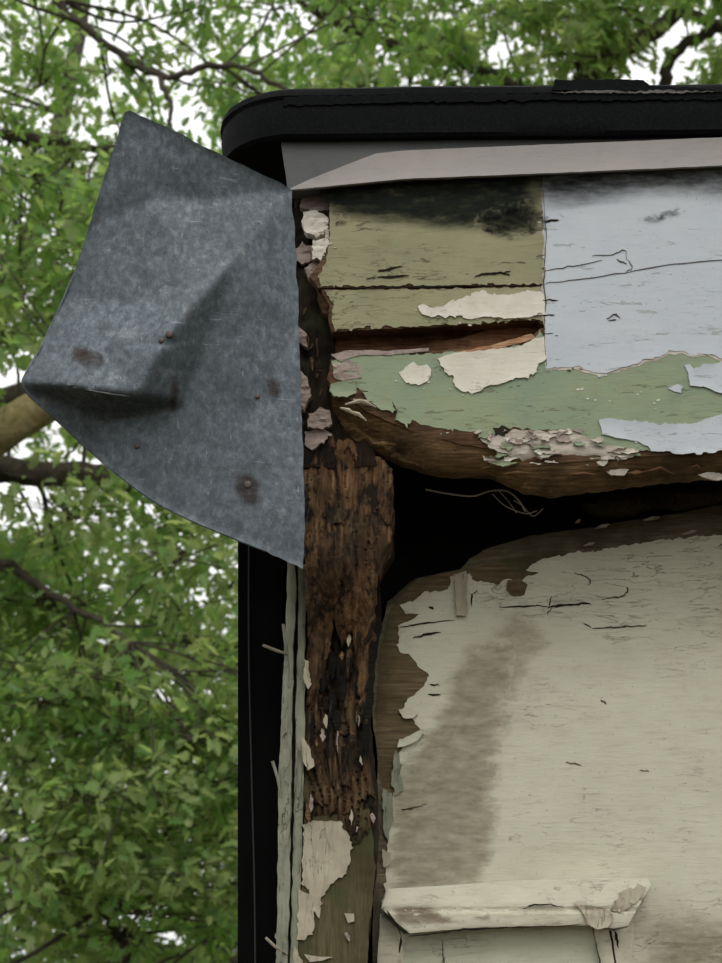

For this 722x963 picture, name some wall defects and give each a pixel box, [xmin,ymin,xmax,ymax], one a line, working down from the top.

leakage [324,178,540,235]
peeling [295,176,722,476]
crack [328,189,719,364]
peeling [275,551,565,963]
crack [387,904,619,963]
spalling [573,884,646,929]